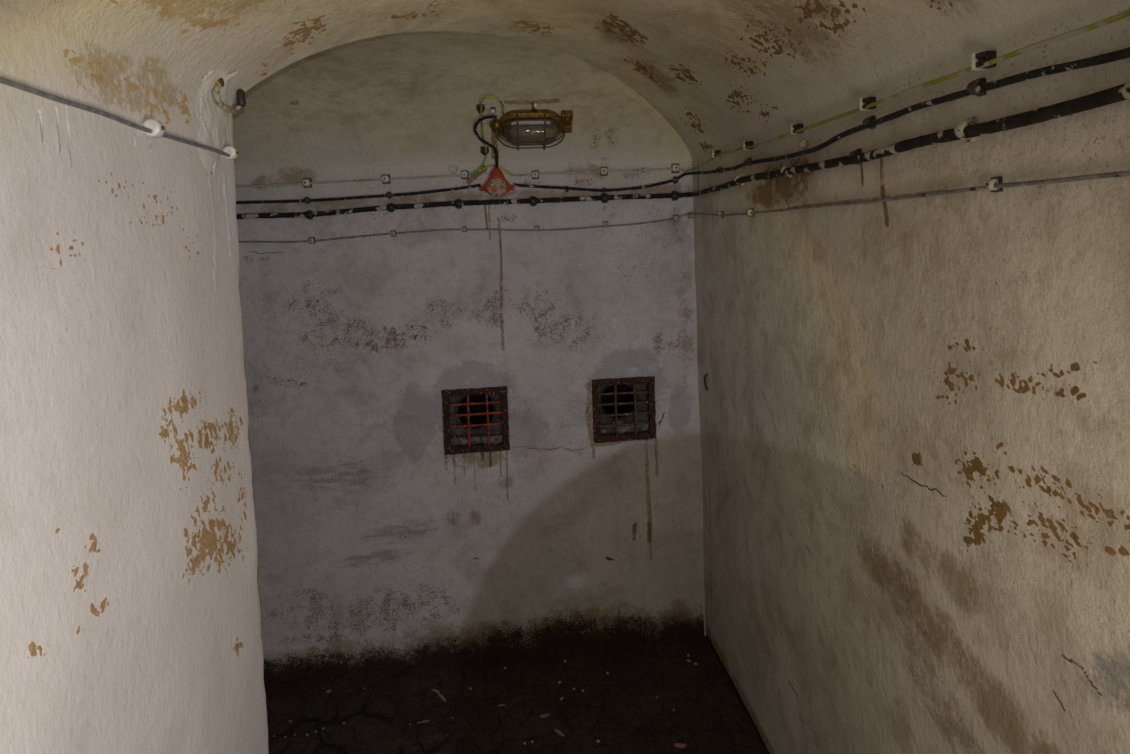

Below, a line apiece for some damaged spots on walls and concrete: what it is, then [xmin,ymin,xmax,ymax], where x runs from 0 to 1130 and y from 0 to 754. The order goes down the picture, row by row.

peeling [62,48,193,124]
peeling [725,0,866,122]
rust [284,205,601,355]
peeling [934,337,980,405]
peeling [995,362,1097,401]
peeling [159,388,247,583]
rust [444,450,509,499]
crack [512,446,589,455]
rust [632,440,658,560]
peeling [912,452,922,466]
peeling [954,436,1130,563]
water stain [264,613,770,754]